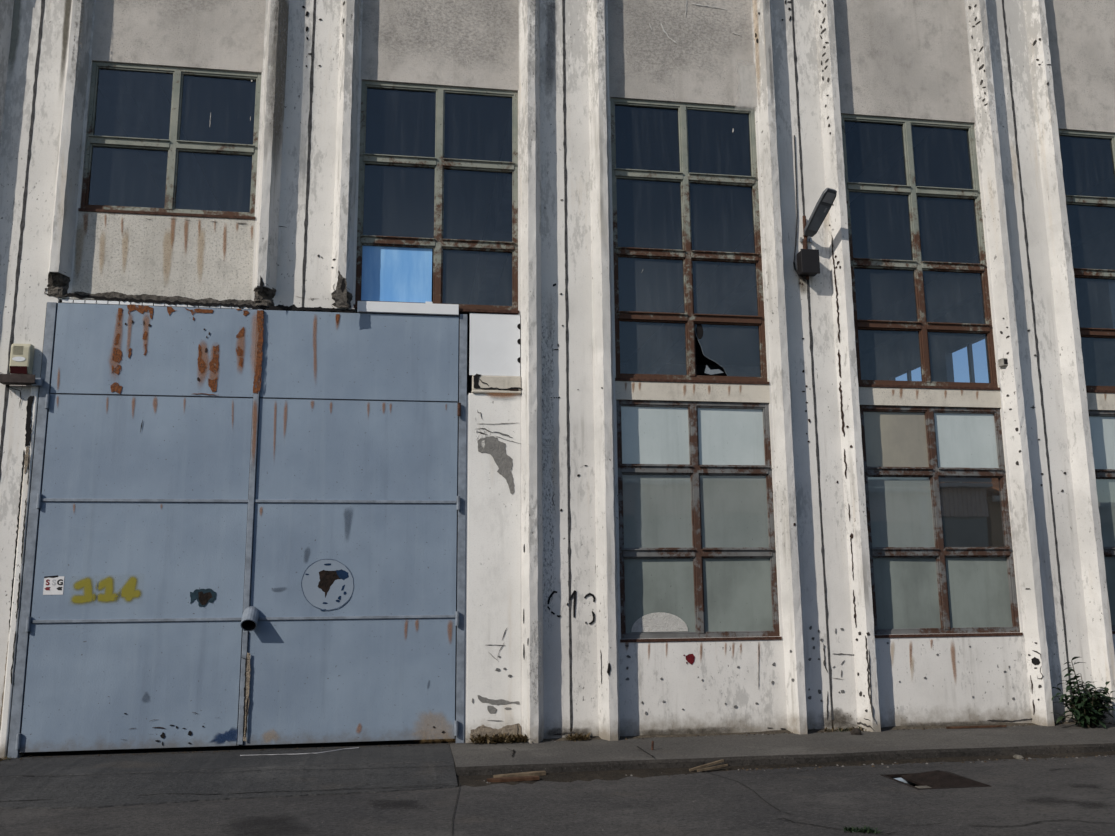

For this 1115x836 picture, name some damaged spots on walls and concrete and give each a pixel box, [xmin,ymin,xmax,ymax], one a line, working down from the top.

damp [270,0,289,149]
spalling [44,255,355,313]
corrosion [106,304,153,408]
corrosion [167,307,219,407]
corrosion [236,309,264,452]
peeling [478,436,514,494]
peeling [190,588,216,607]
peeling [321,563,349,611]